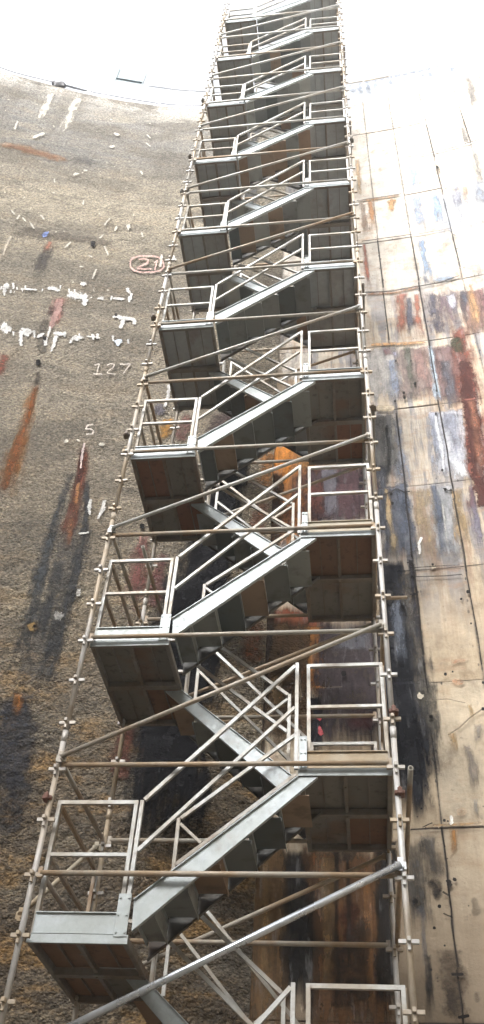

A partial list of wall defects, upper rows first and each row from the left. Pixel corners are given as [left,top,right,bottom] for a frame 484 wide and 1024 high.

leakage [419,240,469,330]
rust [2,372,40,488]
rust [63,443,88,536]
rust [363,244,484,543]
leakage [16,474,107,679]
leakage [270,334,468,812]
leakage [261,611,275,753]